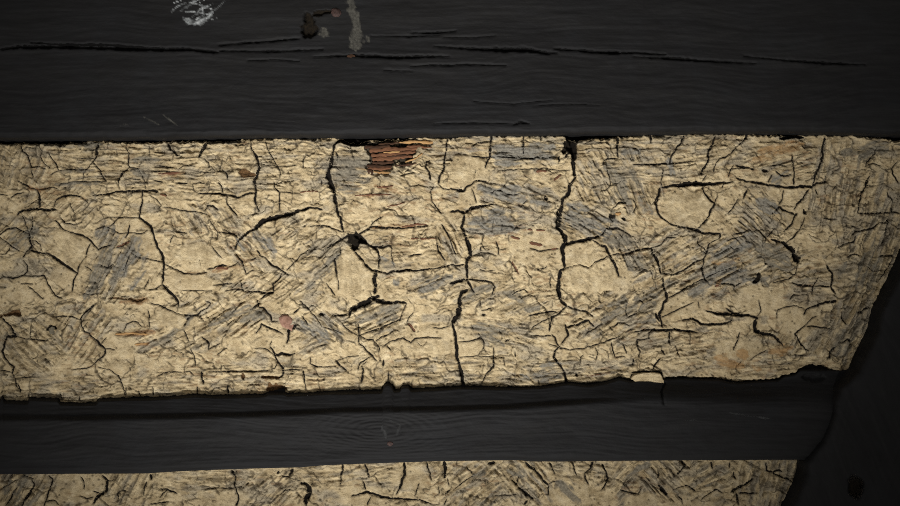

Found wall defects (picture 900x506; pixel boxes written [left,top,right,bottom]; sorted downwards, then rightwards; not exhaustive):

spalling [342,138,433,175]
crack [0,100,899,405]
crack [1,475,58,506]
crack [81,474,177,504]
crack [206,470,249,506]
crack [277,469,313,505]
crack [340,461,792,505]